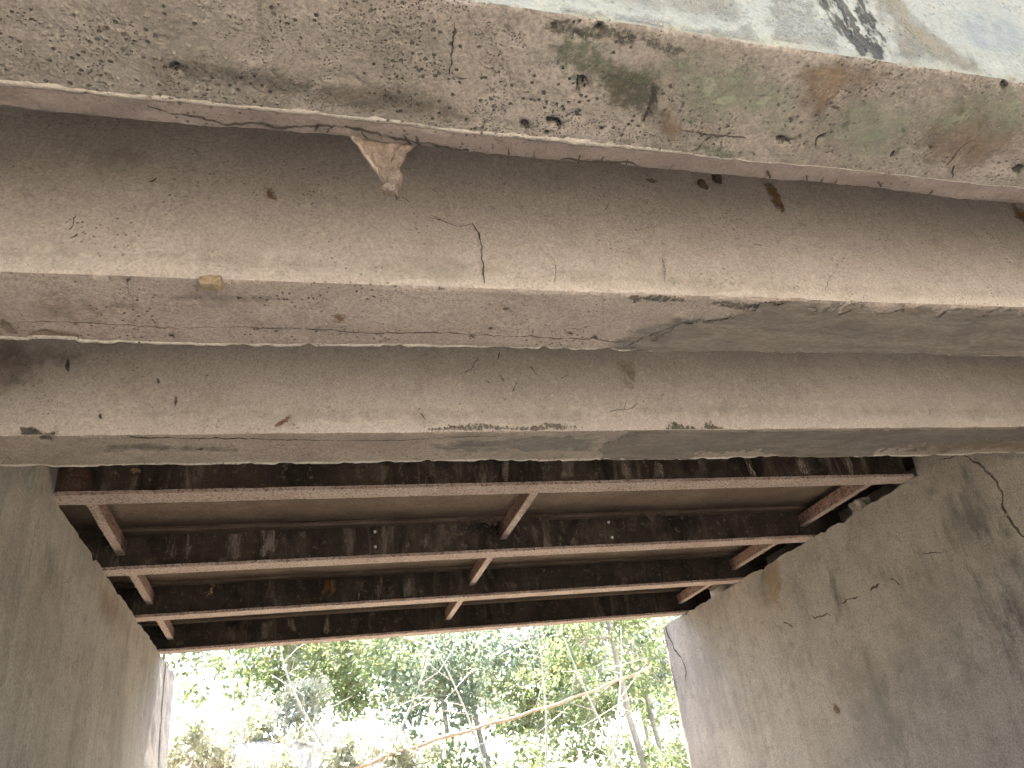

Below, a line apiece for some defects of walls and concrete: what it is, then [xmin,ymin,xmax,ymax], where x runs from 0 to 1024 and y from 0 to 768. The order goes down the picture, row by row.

water stain [681,0,887,60]
peeling [349,136,417,200]
rust [764,183,784,212]
crack [429,190,485,283]
crack [941,455,1024,537]
crack [783,578,900,627]